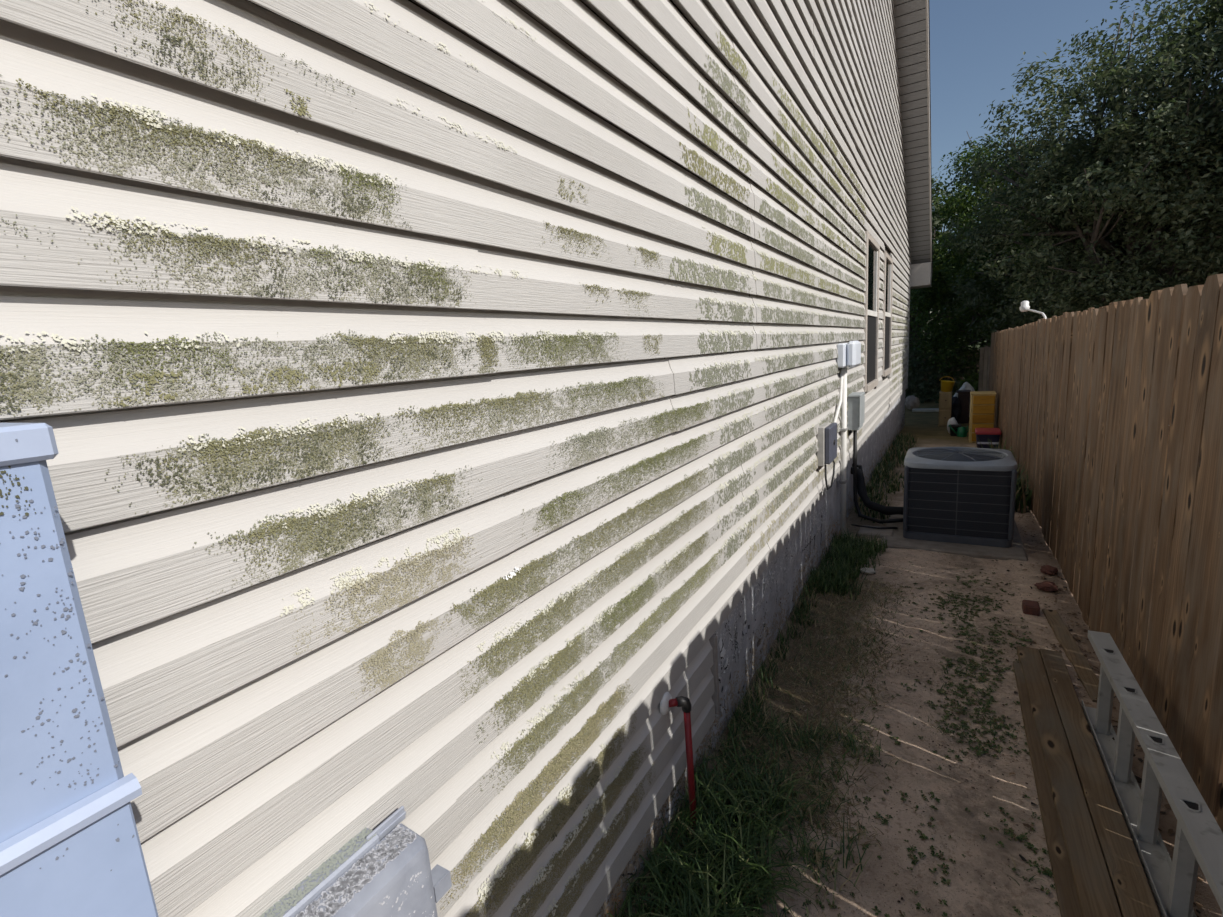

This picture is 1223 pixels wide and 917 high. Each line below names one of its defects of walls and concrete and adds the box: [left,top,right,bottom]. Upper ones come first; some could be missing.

damp [258,180,413,229]
damp [558,178,589,203]
damp [239,255,463,306]
damp [0,355,37,413]
mould [101,349,478,407]
mould [135,426,388,502]
damp [311,485,455,558]